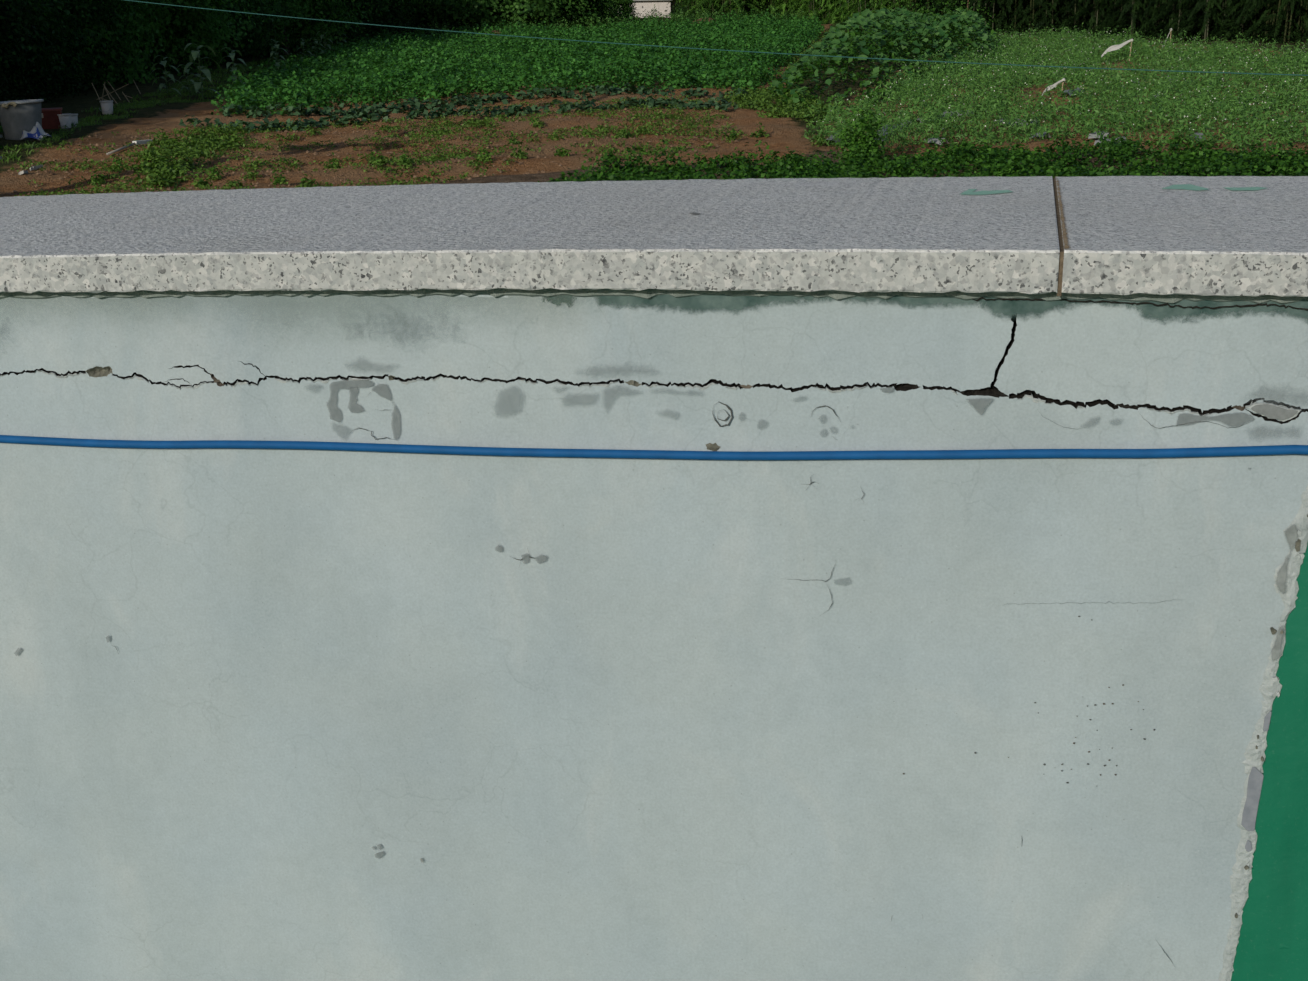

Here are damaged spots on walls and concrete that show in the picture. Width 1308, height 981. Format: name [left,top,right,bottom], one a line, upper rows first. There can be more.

crack [0,361,958,395]
crack [960,297,1308,429]
peeling [1177,402,1302,426]
peeling [1219,485,1308,981]